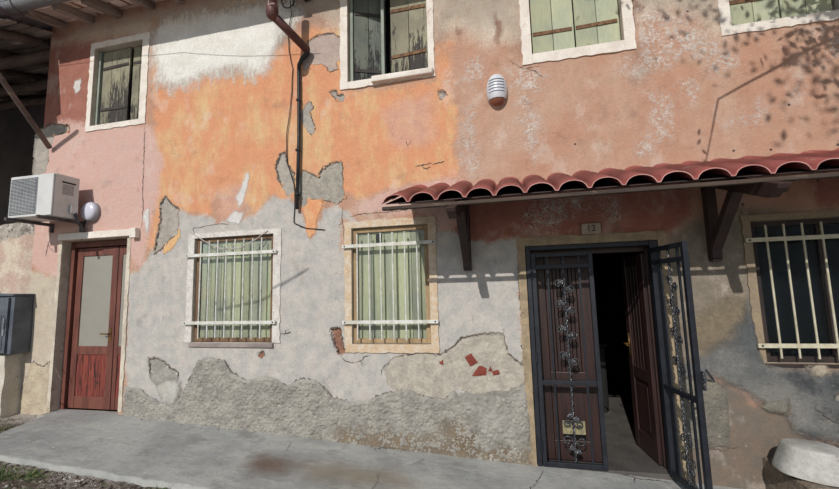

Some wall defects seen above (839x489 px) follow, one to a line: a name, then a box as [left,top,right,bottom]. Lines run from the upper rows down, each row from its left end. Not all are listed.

spalling [302,32,340,72]
spalling [301,101,316,135]
spalling [274,150,347,238]
spalling [153,196,180,256]
spalling [329,327,345,355]
spalling [122,332,532,465]